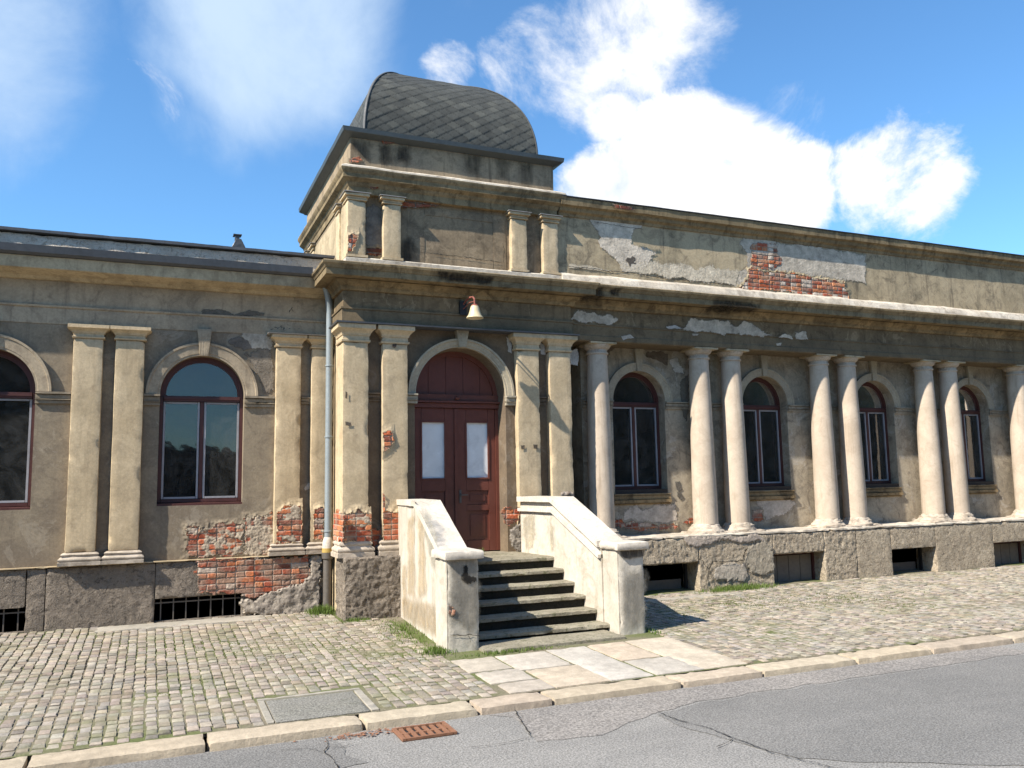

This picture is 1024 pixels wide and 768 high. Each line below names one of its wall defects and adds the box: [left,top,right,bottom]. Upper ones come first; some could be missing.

peeling [347,204,382,259]
flaking render [569,220,866,299]
peeling [571,310,618,325]
peeling [666,318,808,346]
flaking render [382,423,395,461]
flaking render [500,507,521,552]
flaking render [176,493,416,616]